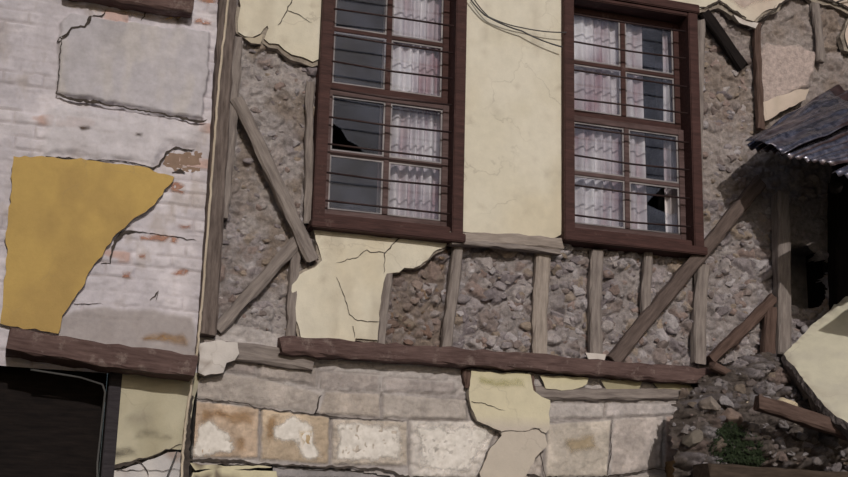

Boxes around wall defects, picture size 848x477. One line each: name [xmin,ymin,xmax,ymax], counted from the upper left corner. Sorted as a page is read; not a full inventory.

crack [56,10,206,123]
crack [46,146,195,173]
spalling [623,0,848,369]
flaking render [0,151,202,334]
crack [101,230,195,264]
spalling [385,248,451,347]
damp [193,421,234,457]
crack [115,396,424,477]
damp [274,417,318,459]
damp [337,423,400,461]
damp [417,427,487,471]
flaking render [466,371,588,477]